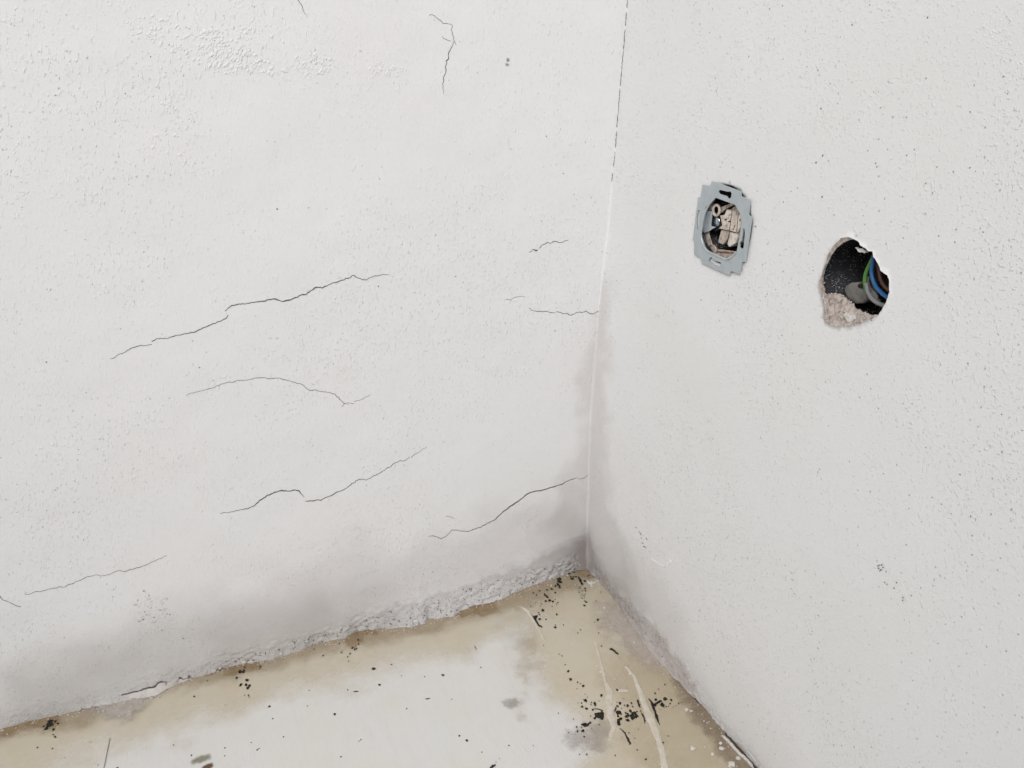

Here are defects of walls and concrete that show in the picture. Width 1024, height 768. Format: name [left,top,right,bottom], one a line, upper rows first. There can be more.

crack [431,14,456,91]
crack [112,274,386,359]
crack [506,296,599,315]
crack [188,377,364,407]
crack [223,448,424,513]
crack [434,475,588,539]
crack [0,555,167,607]
leakage [0,555,753,768]